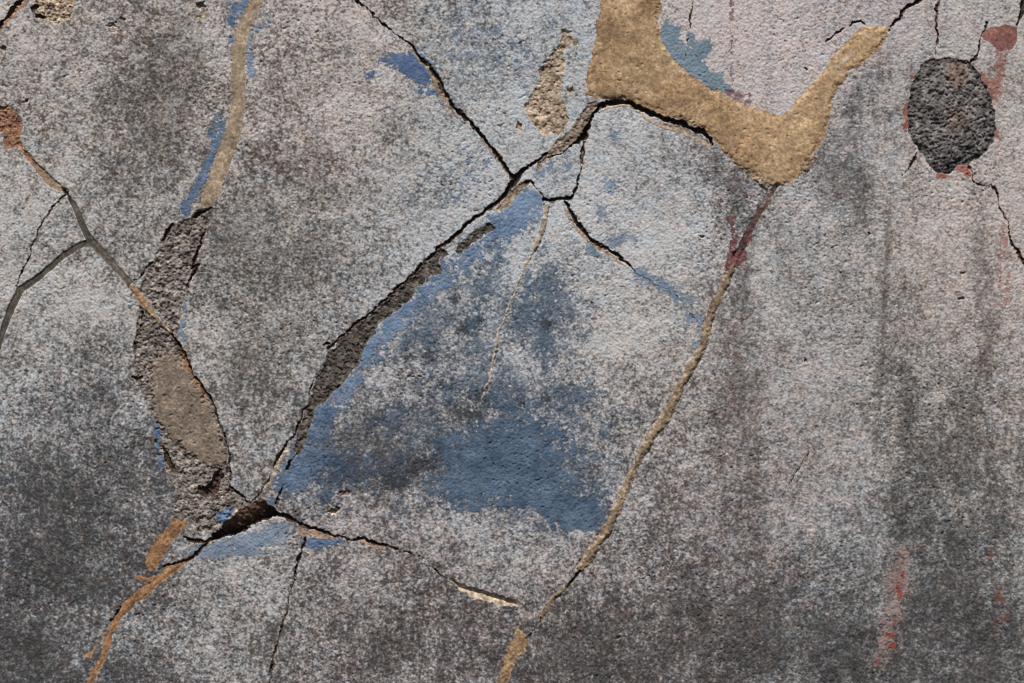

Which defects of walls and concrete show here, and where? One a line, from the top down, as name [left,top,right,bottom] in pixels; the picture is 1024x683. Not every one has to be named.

crack [825,0,940,55]
crack [969,21,989,64]
crack [1015,0,1024,26]
crack [901,153,917,176]
crack [15,187,72,287]
crack [967,163,1024,265]
peeling [133,8,616,560]
crack [133,310,144,351]
crack [170,0,714,683]